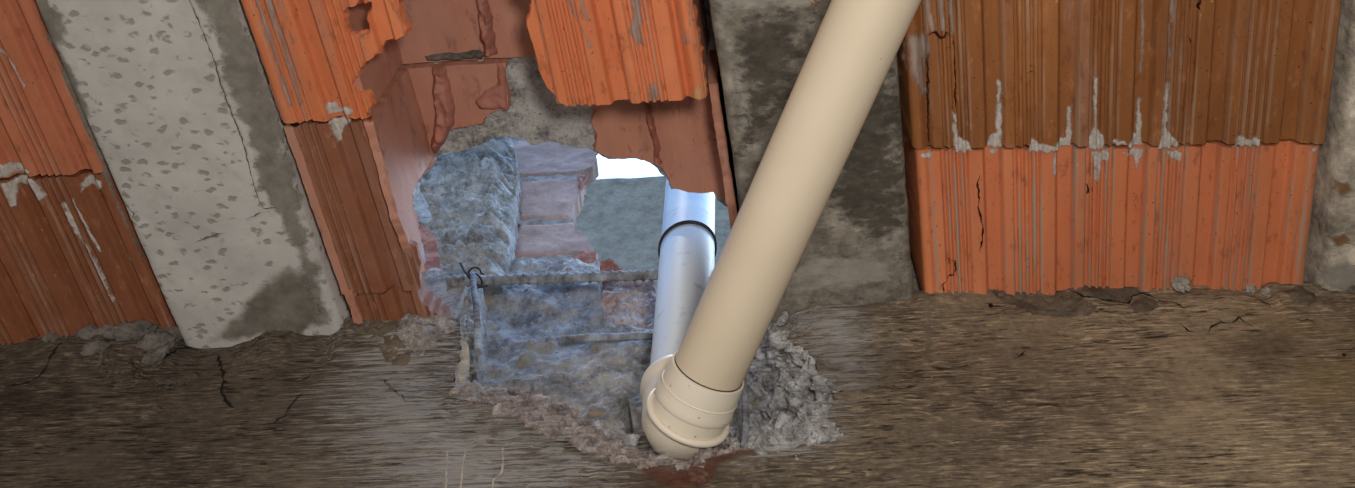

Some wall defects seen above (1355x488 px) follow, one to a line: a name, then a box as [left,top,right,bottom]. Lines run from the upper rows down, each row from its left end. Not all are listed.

peeling [413,191,434,227]
spalling [600,258,656,330]
crack [1072,291,1316,337]
crack [8,342,61,386]
crack [163,346,233,408]
crack [273,372,312,424]
spalling [343,286,845,471]